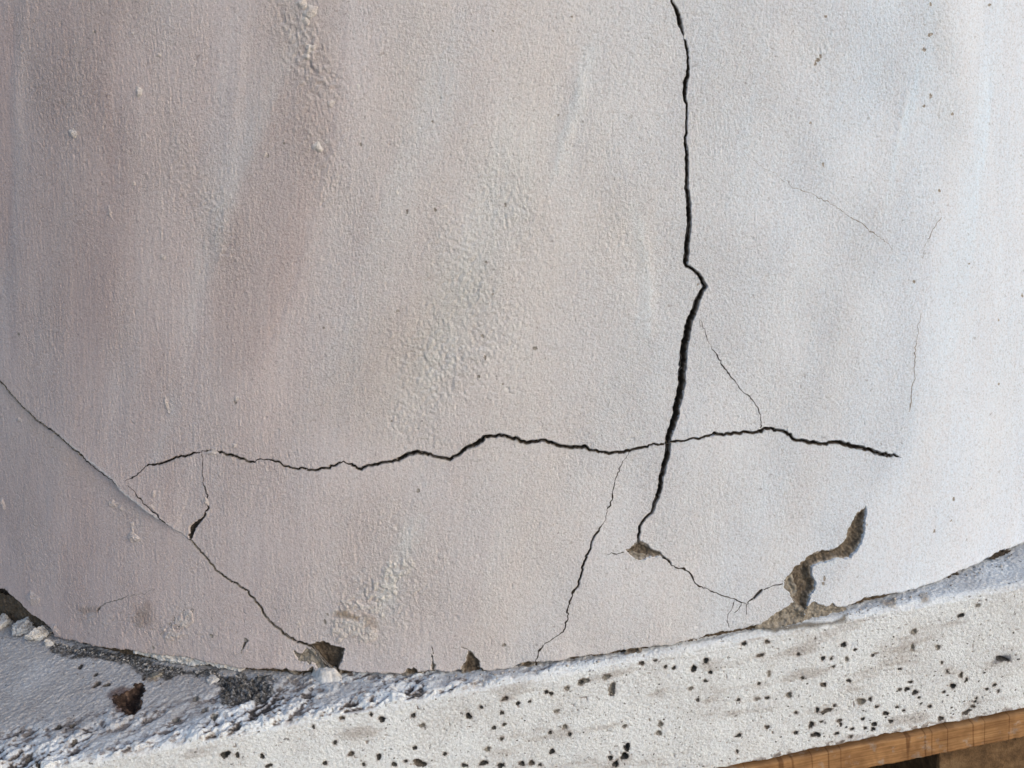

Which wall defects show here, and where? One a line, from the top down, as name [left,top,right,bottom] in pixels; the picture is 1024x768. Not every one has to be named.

crack [0,0,902,668]
spalling [681,508,894,657]
peeling [0,559,416,721]
spalling [333,696,531,768]
spalling [518,724,590,766]
spalling [753,669,905,742]
spalling [896,640,1003,721]